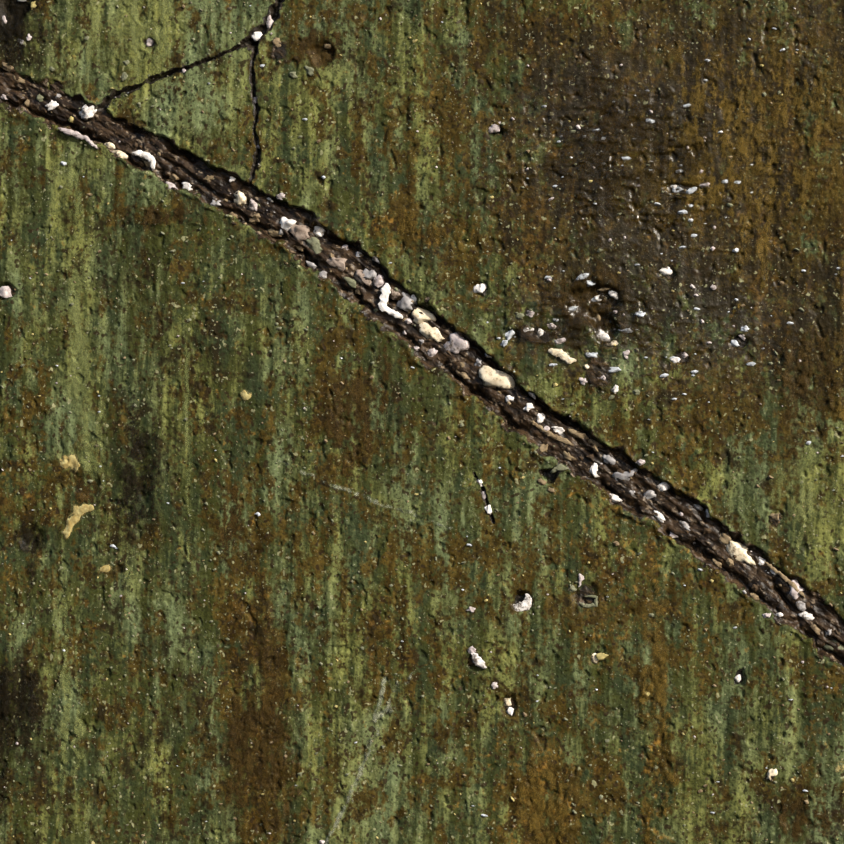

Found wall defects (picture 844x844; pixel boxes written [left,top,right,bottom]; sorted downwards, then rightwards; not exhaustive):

rust [298,12,348,69]
leakage [543,43,709,214]
rust [643,33,844,289]
crack [0,0,844,667]
rust [546,262,623,330]
leakage [540,279,655,367]
rust [323,338,392,485]
rust [62,475,98,525]
rust [216,489,244,556]
rust [779,786,831,842]